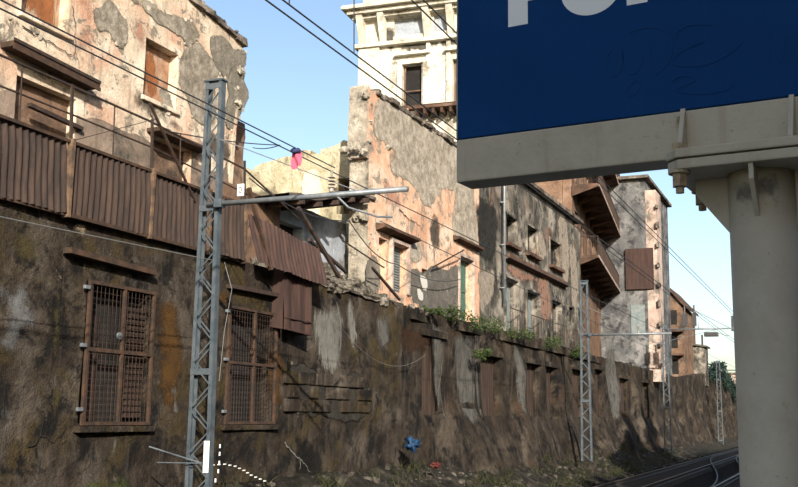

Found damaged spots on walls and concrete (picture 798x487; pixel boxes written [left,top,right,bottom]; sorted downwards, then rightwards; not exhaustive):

flaking render [93,0,128,49]
flaking render [132,0,249,139]
flaking render [339,91,477,254]
flaking render [410,242,458,317]
water stain [314,301,357,374]